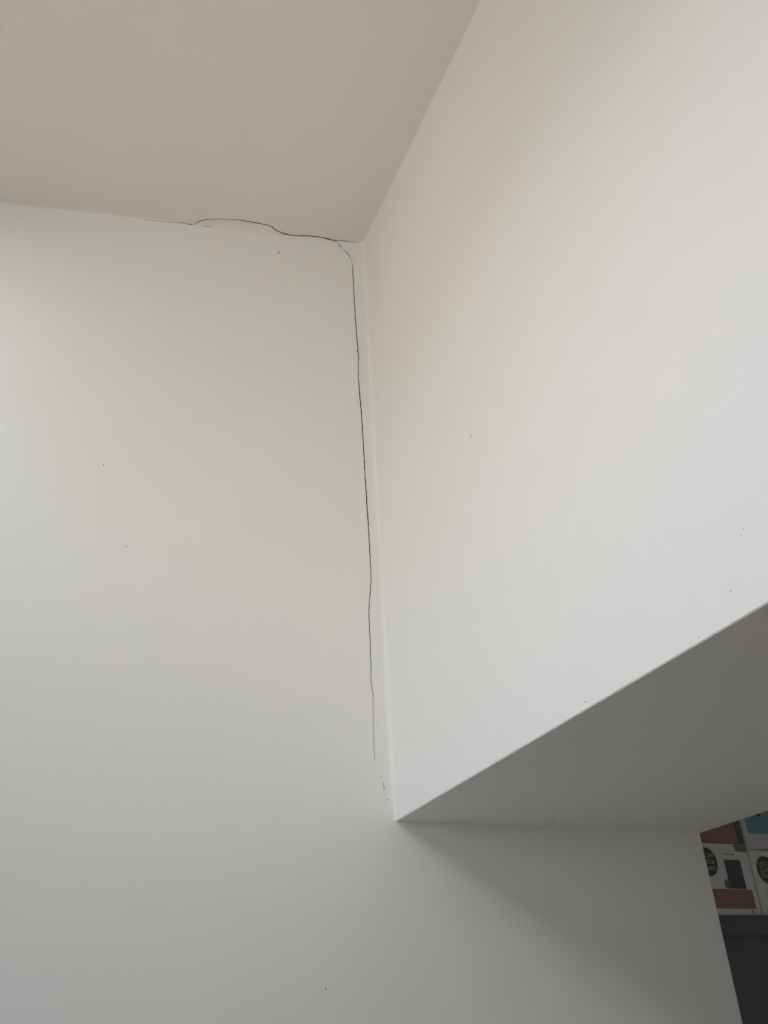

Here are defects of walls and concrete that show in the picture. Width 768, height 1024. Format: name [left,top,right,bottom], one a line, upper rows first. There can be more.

crack [149,219,375,758]